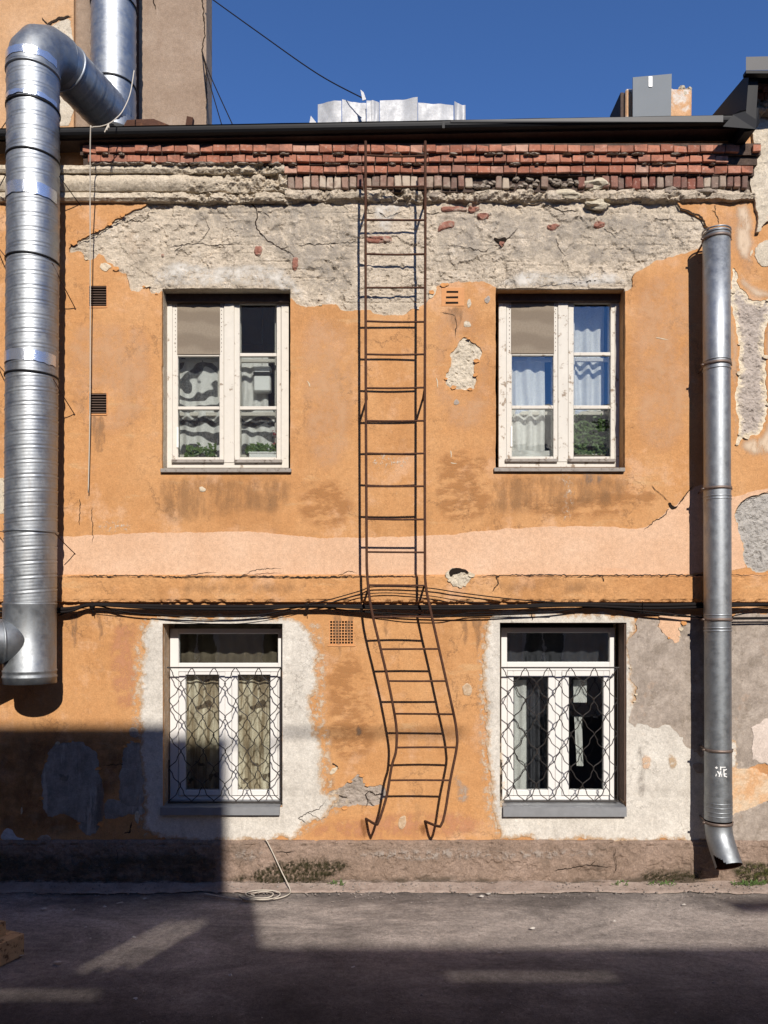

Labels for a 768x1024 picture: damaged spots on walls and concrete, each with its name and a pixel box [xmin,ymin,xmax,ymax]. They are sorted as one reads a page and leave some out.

crack [78,212,149,243]
crack [172,194,356,257]
spalling [70,193,707,316]
peeling [737,206,753,258]
spalling [444,321,482,405]
peeling [731,268,768,453]
crack [644,487,691,530]
spalling [735,493,768,573]
spalling [445,568,475,588]
peeling [658,612,703,643]
peeling [321,774,386,820]
peeling [732,767,768,815]